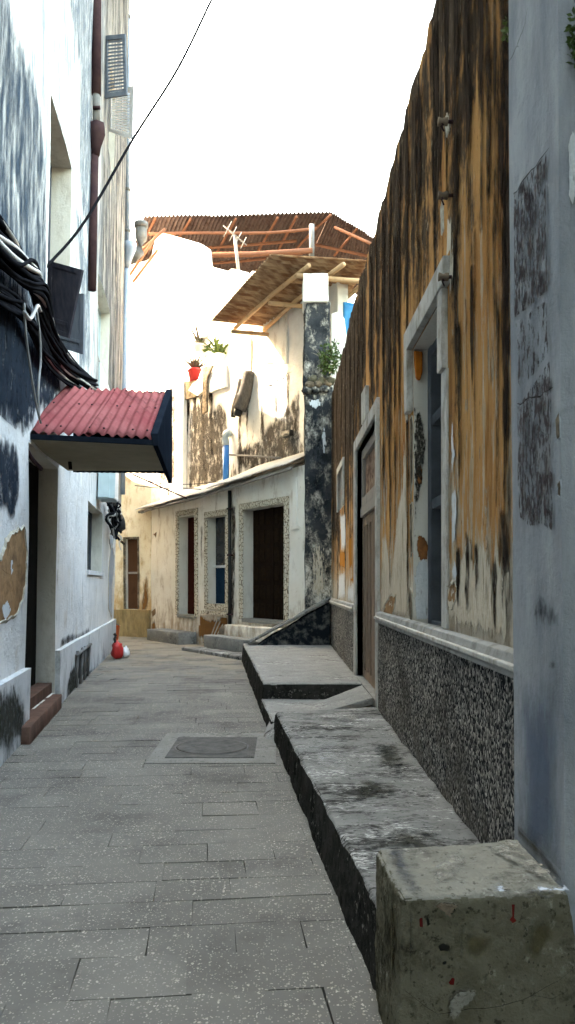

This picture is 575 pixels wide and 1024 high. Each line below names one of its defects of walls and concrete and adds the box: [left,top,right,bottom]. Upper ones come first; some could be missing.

damp [311,0,510,627]
damp [160,374,299,483]
peeling [382,414,428,620]
flaking render [0,524,28,624]
damp [0,686,24,746]